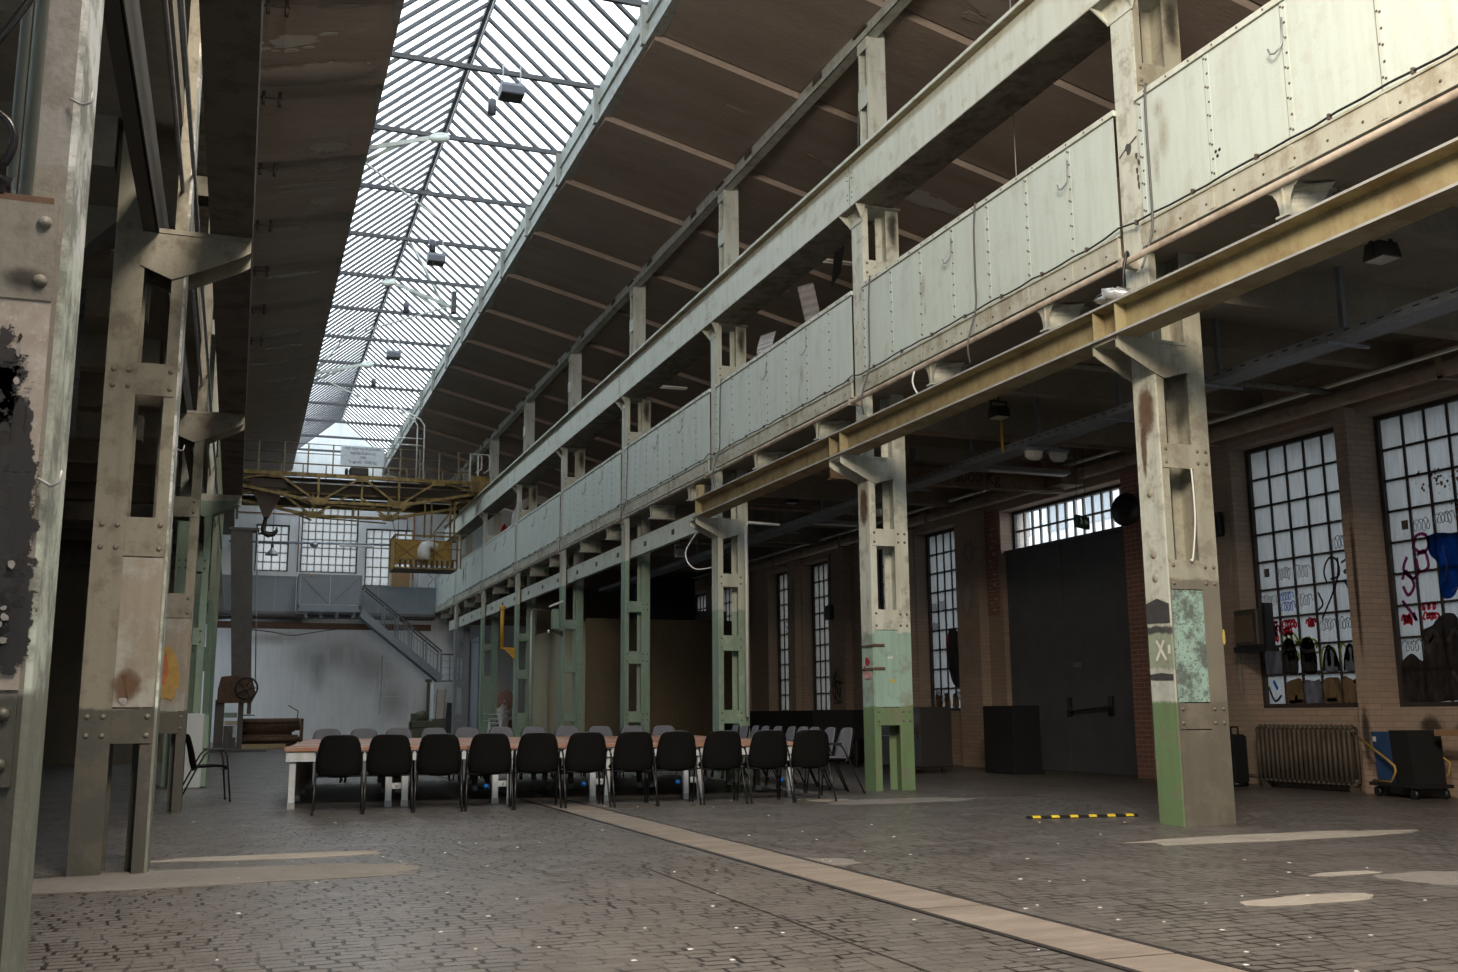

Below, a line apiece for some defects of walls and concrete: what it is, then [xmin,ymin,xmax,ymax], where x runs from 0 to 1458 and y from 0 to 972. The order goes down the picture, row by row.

peeling [0,322,41,676]
corrosion [113,670,139,699]